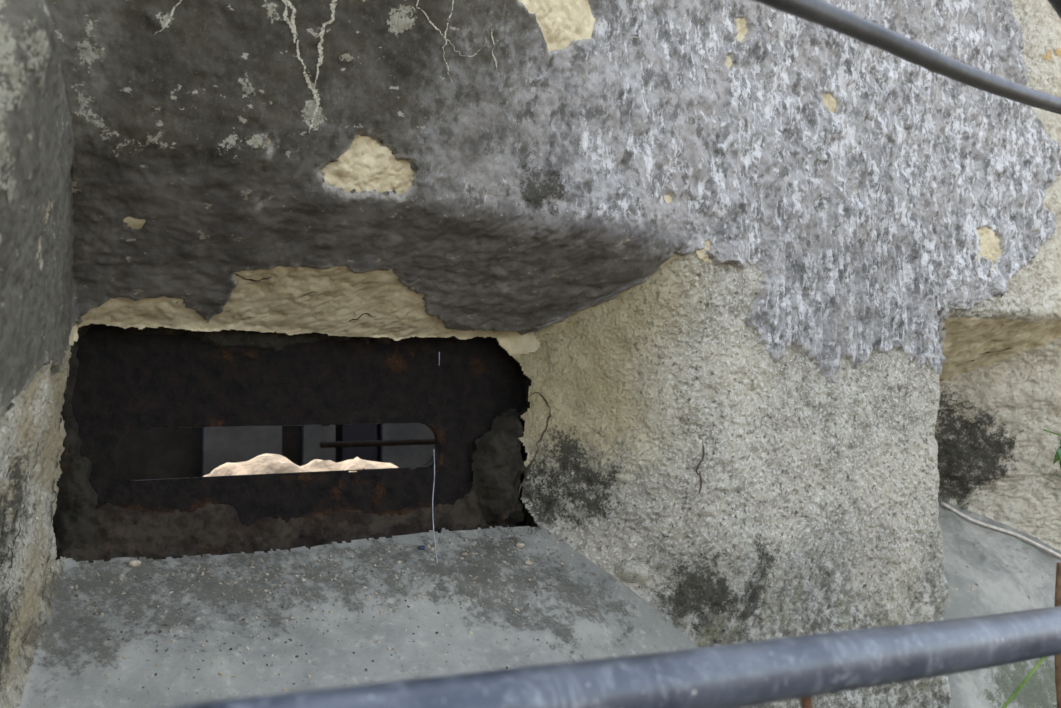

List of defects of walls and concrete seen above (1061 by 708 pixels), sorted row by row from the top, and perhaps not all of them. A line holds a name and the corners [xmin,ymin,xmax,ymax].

spalling [518,0,596,52]
spalling [321,135,418,195]
spalling [975,227,1001,271]
spalling [69,265,540,354]
rust [52,323,528,562]
water stain [934,384,1025,512]
water stain [0,425,633,701]
water stain [656,529,778,635]